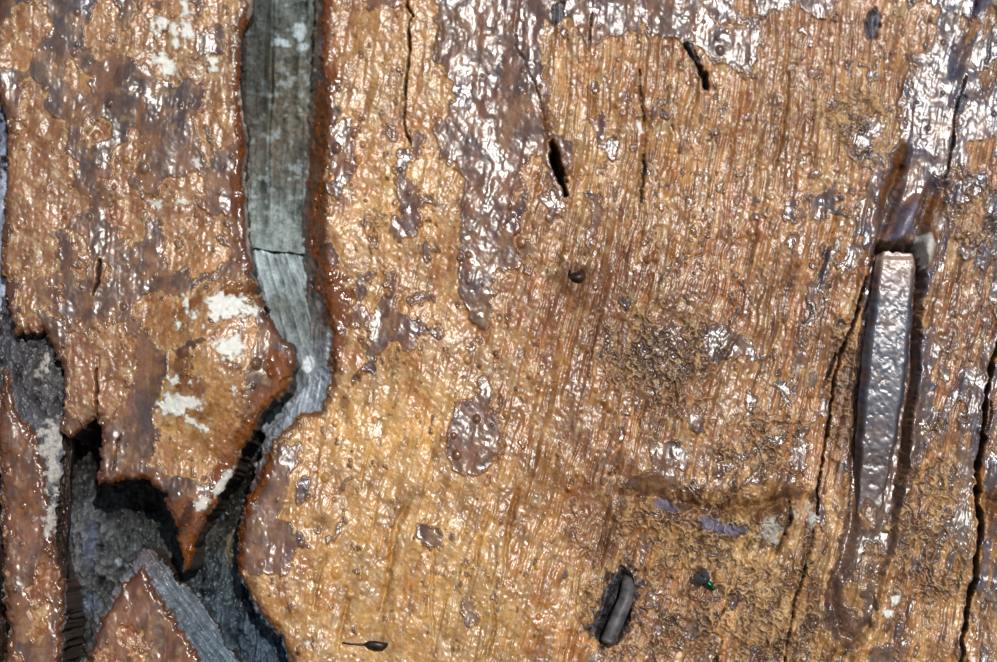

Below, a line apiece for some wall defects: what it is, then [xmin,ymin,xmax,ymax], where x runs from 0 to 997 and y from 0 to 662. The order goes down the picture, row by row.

peeling [2,529,16,585]
peeling [0,0,262,424]
peeling [147,399,241,490]
crack [403,0,415,146]
crack [514,0,549,138]
peeling [237,0,997,662]
crack [773,276,867,662]
crack [959,341,997,662]